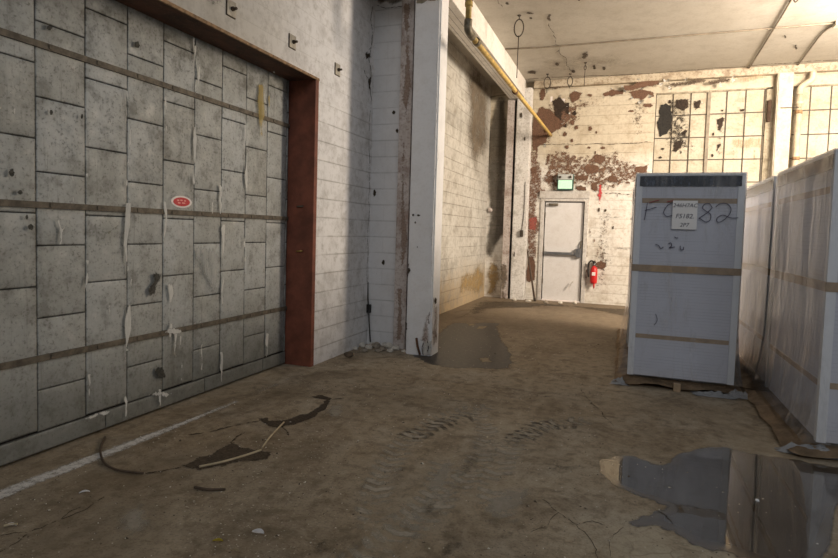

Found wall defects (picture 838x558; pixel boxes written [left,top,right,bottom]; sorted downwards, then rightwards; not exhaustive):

peeling [524,75,736,286]
leakage [414,263,563,369]
leakage [587,307,628,316]